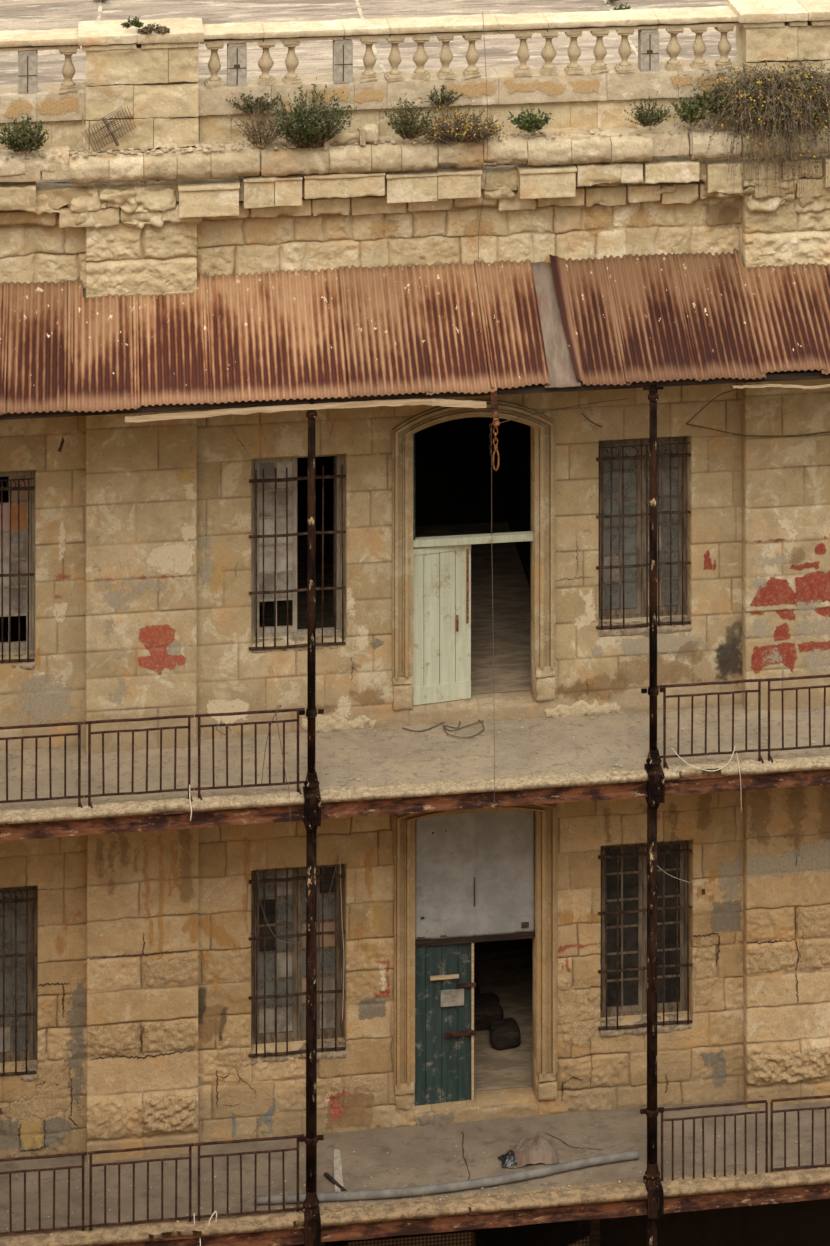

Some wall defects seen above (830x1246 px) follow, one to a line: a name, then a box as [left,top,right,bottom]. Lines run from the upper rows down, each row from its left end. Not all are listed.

flaking render [94,522,196,704]
flaking render [347,588,384,652]
water stain [717,622,742,680]
peeling [746,518,830,675]
spalling [300,696,379,732]
crack [693,907,800,1004]
spalling [0,1046,73,1150]